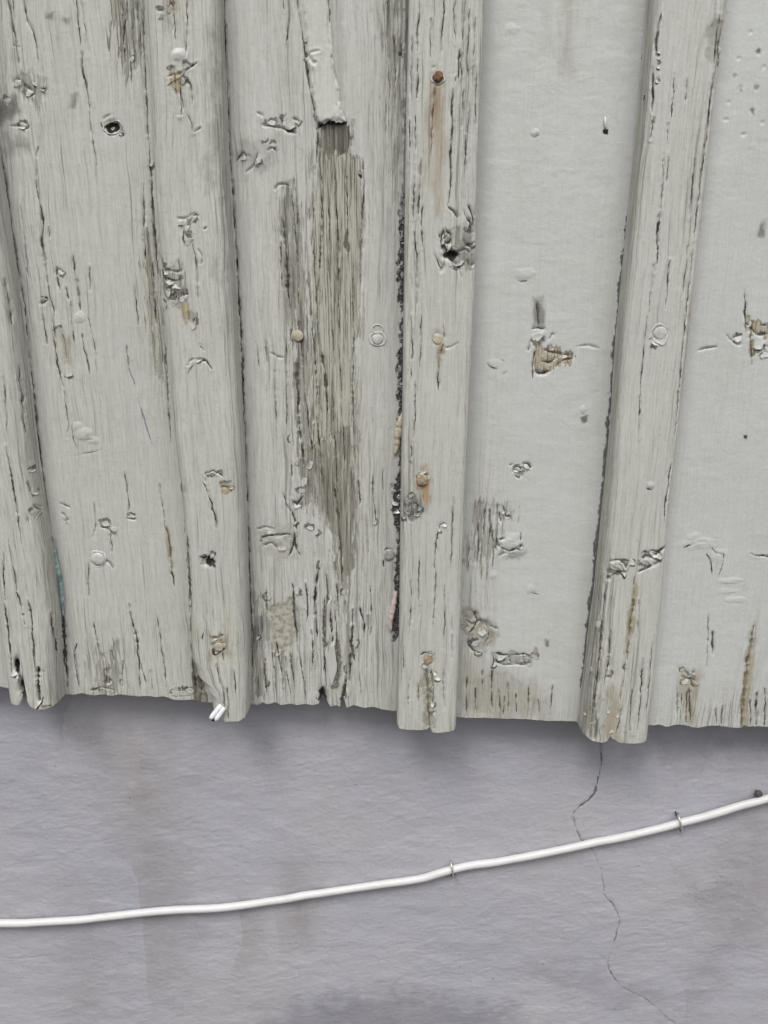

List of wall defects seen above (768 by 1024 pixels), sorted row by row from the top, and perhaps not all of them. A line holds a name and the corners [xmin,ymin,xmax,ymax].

peeling [107,0,188,87]
peeling [136,187,199,380]
peeling [444,244,474,266]
peeling [237,0,373,700]
peeling [528,303,576,378]
peeling [730,295,768,359]
corrosion [417,480,429,505]
peeling [462,495,520,579]
peeling [460,609,539,669]
peeling [582,547,664,742]